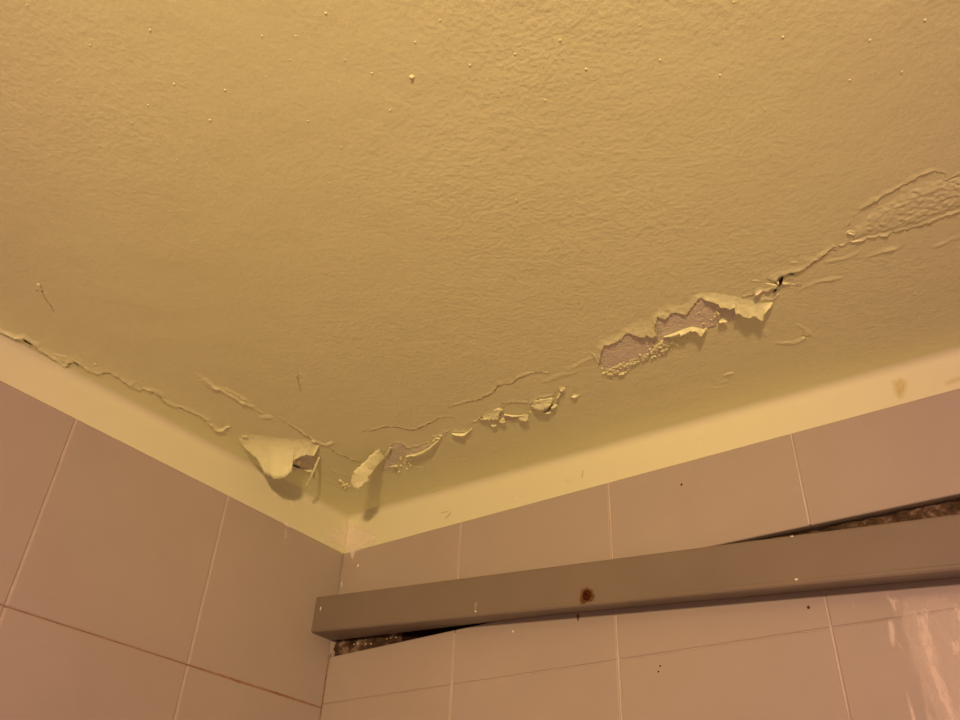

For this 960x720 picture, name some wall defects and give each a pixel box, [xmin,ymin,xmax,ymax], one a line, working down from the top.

peeling [592,292,773,376]
crack [0,327,230,432]
crack [363,356,596,432]
peeling [238,434,323,487]
peeling [338,385,579,490]
spalling [774,500,960,538]
spalling [334,622,490,656]